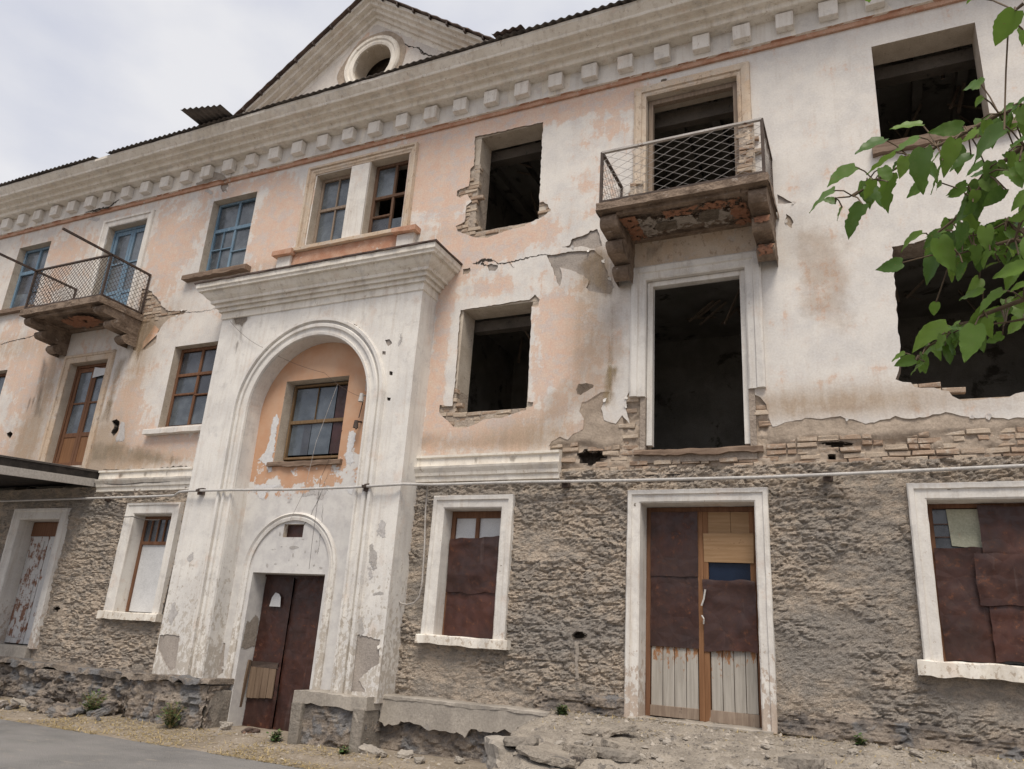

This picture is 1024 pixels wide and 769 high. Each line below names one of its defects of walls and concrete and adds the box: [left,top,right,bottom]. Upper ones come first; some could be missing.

flaking render [456,166,551,238]
peeling [619,197,770,241]
crack [474,254,548,267]
flaking render [548,230,614,294]
flaking render [134,289,186,352]
peeling [253,414,281,500]
peeling [345,431,356,466]
flaking render [440,389,533,428]
flaking render [550,384,1024,477]
flaking render [157,602,179,670]
flaking render [351,617,383,692]